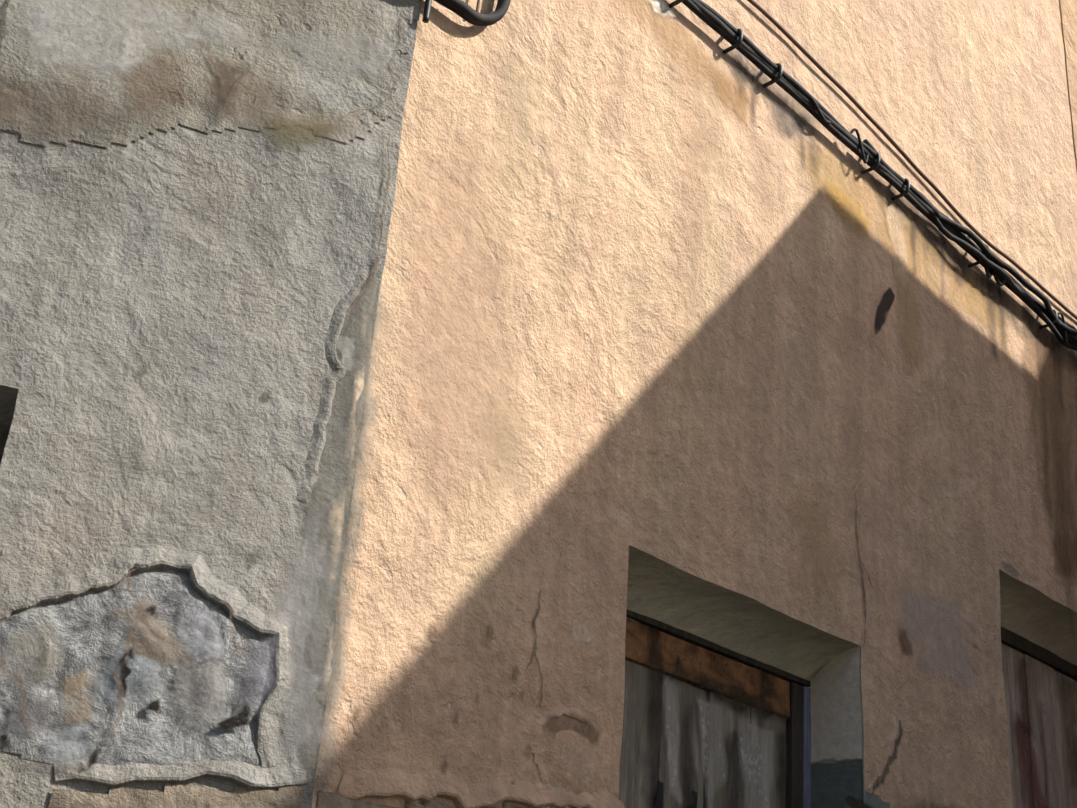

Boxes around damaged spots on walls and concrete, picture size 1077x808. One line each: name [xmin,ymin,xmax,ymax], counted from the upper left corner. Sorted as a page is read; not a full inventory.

crack [0,0,10,48]
water stain [736,54,749,76]
spalling [0,258,625,808]